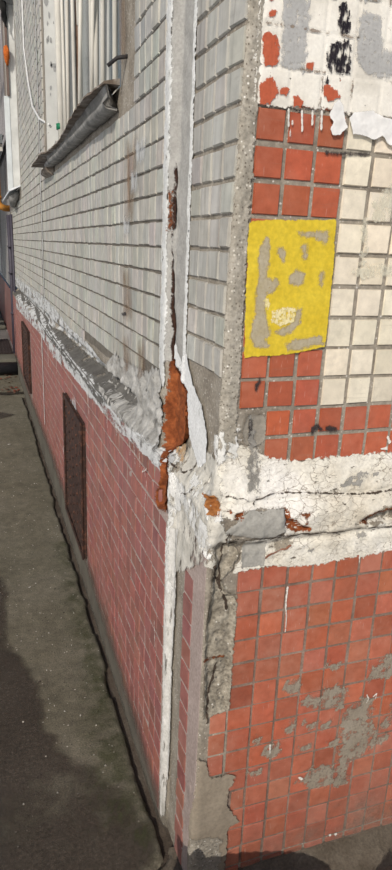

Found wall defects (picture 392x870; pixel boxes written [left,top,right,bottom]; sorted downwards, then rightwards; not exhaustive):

peeling [323,84,340,102]
spalling [155,0,312,720]
crack [225,488,392,514]
spalling [356,505,392,539]
crack [213,526,392,610]
crack [206,662,217,724]